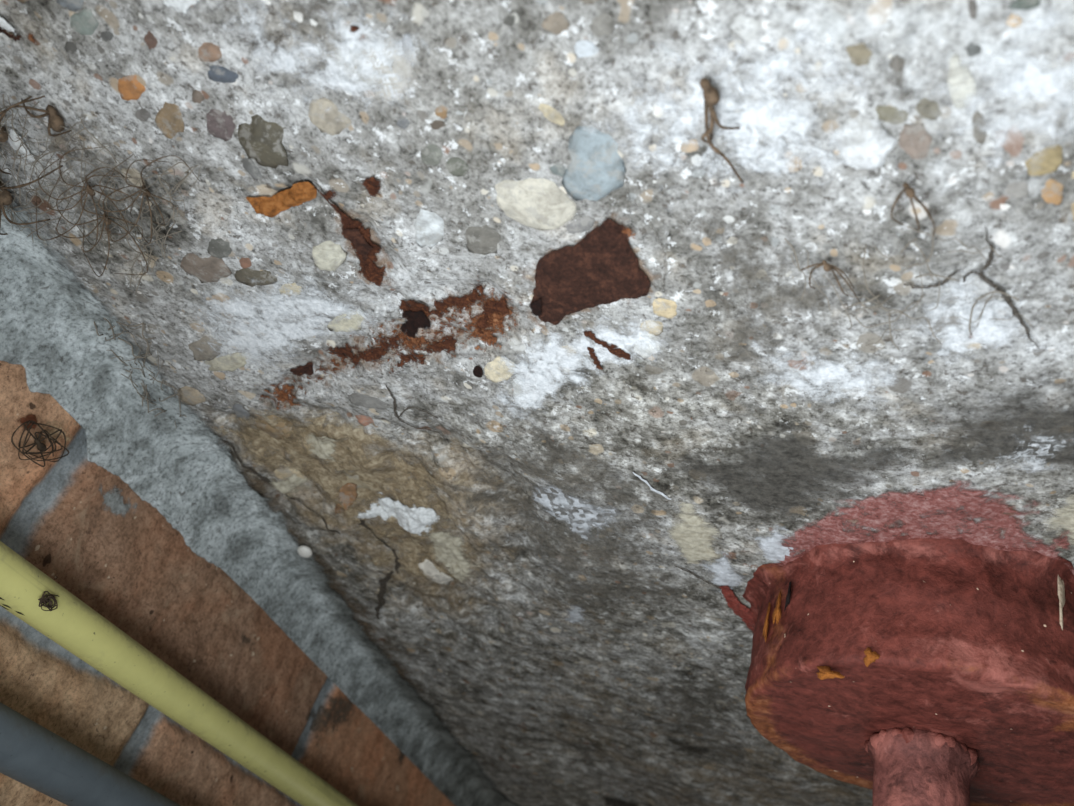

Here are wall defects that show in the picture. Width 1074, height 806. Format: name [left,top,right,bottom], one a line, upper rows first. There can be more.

corrosion [314,186,388,287]
corrosion [362,177,382,197]
corrosion [260,215,653,410]
spalling [18,414,37,430]
spalling [211,412,474,620]